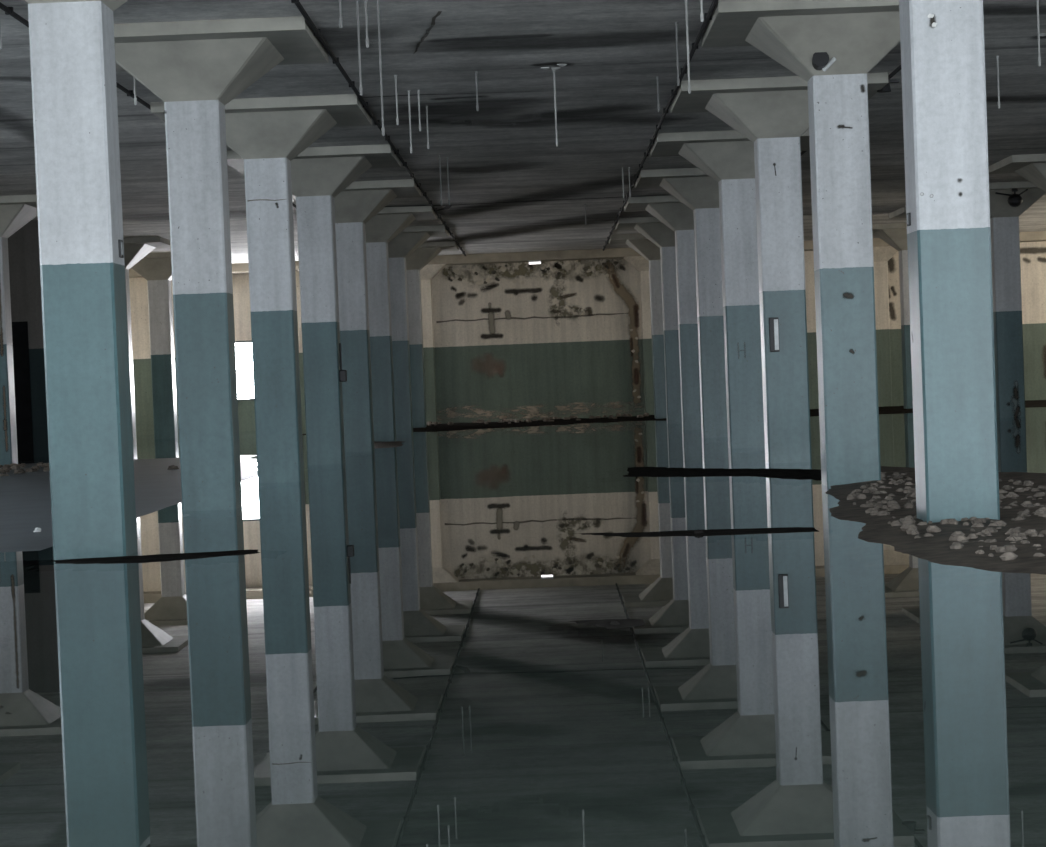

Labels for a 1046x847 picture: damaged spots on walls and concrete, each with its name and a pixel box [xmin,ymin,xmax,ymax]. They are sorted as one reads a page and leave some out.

damp [436,33,669,48]
damp [402,96,679,127]
peeling [442,258,625,291]